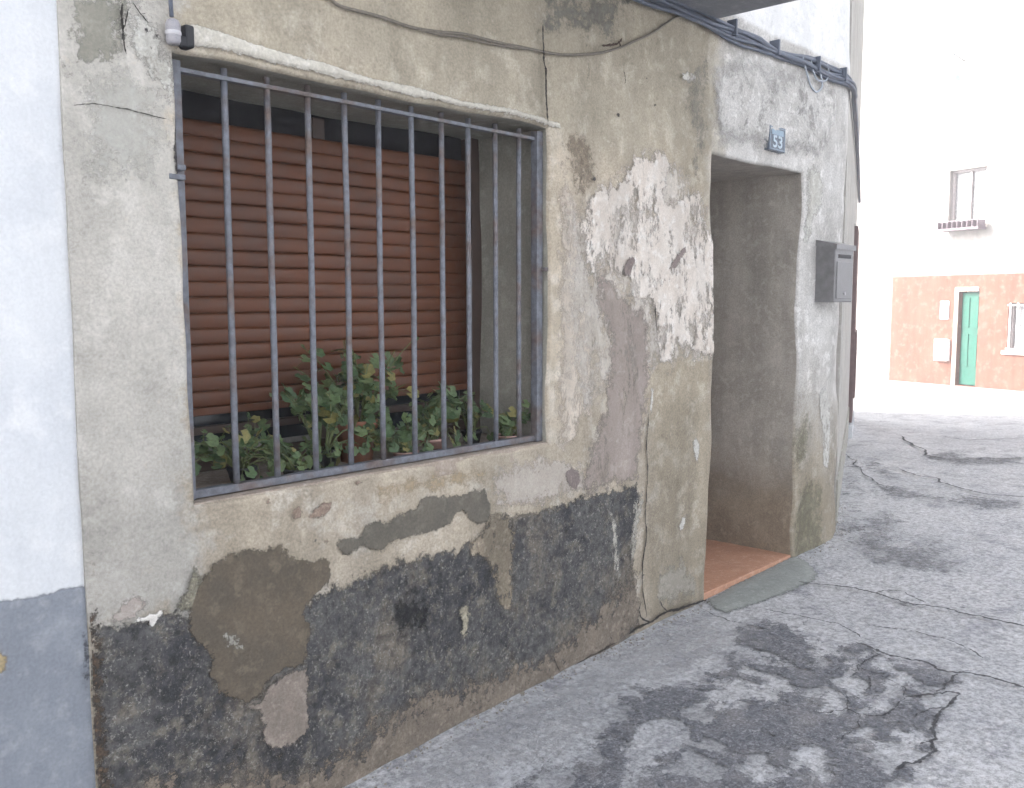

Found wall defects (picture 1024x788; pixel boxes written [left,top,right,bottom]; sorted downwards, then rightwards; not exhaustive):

crack [120,3,148,52]
crack [77,103,166,119]
crack [541,26,549,120]
peeling [469,136,714,612]
crack [847,436,1024,497]
damp [608,494,644,582]
crack [554,414,740,672]
peeling [223,632,243,649]
spalling [459,606,471,637]
crack [799,581,1024,626]
spalling [249,668,311,750]
crack [766,609,1024,770]